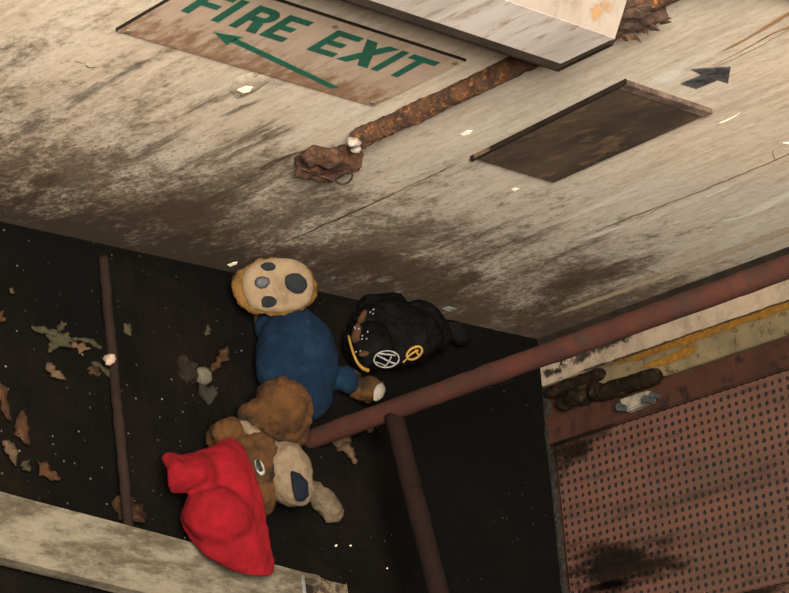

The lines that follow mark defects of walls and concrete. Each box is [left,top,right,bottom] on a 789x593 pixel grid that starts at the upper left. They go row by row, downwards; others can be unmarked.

rust [619,3,672,43]
rust [712,13,789,66]
water stain [73,61,146,102]
water stain [186,121,289,169]
water stain [29,173,58,188]
water stain [136,157,286,239]
crack [575,153,789,240]
water stain [336,242,510,300]
water stain [544,336,630,378]
rust [579,299,789,372]
water stain [575,542,685,593]